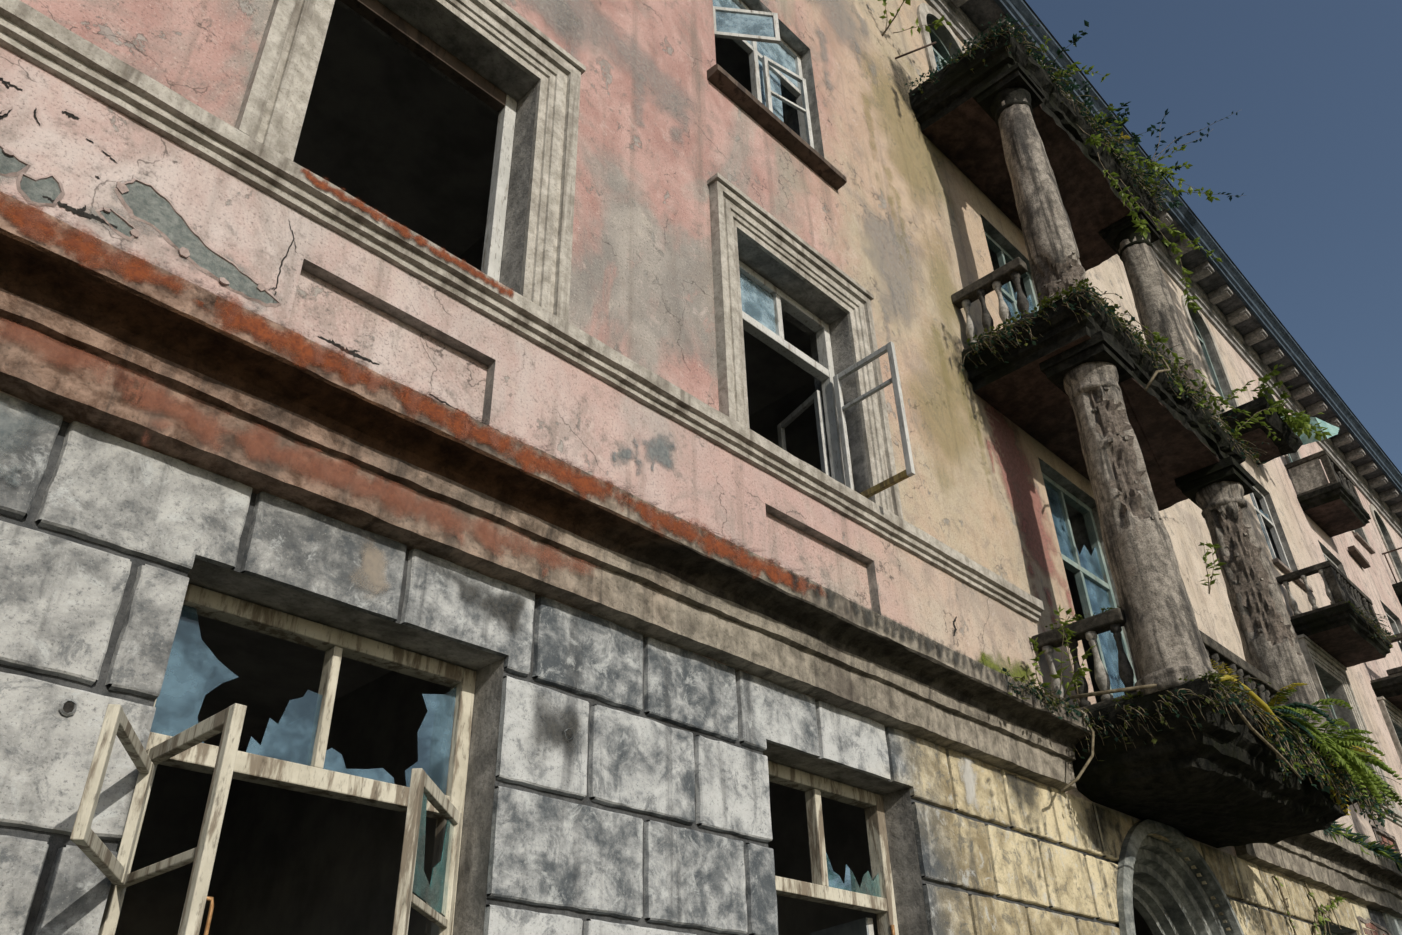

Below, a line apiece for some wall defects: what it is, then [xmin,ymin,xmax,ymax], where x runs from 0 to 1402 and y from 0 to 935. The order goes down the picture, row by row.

crack [0,78,23,90]
flaking render [0,144,65,207]
flaking render [91,174,282,310]
rust [302,168,514,297]
rust [0,195,823,594]
flaking render [1357,916,1392,935]